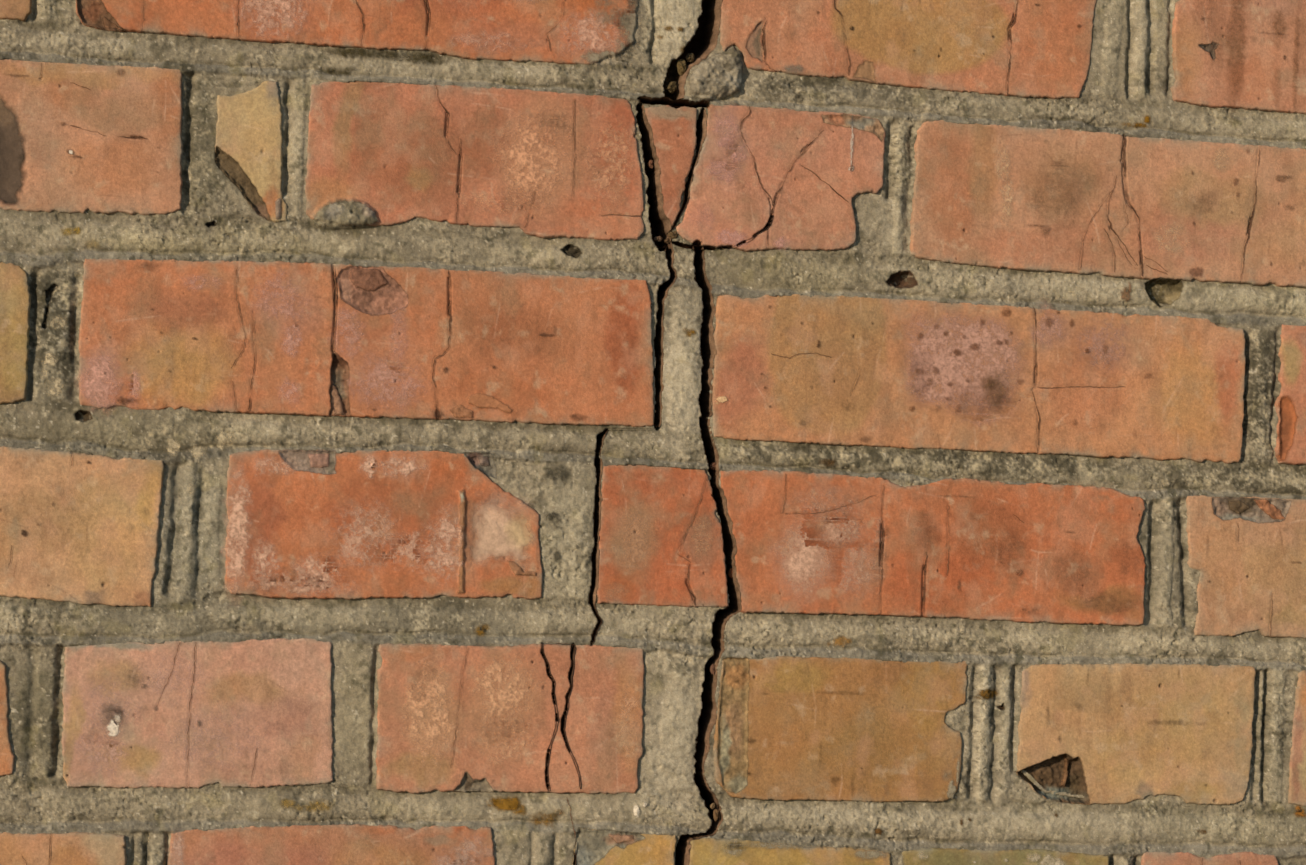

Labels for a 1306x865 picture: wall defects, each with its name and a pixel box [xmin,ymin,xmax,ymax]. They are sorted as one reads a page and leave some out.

spalling [77,0,126,33]
spalling [0,98,25,204]
spalling [215,146,281,221]
crack [570,101,578,198]
spalling [329,351,351,416]
crack [601,0,848,865]
crack [541,429,608,865]
spalling [1015,754,1090,804]